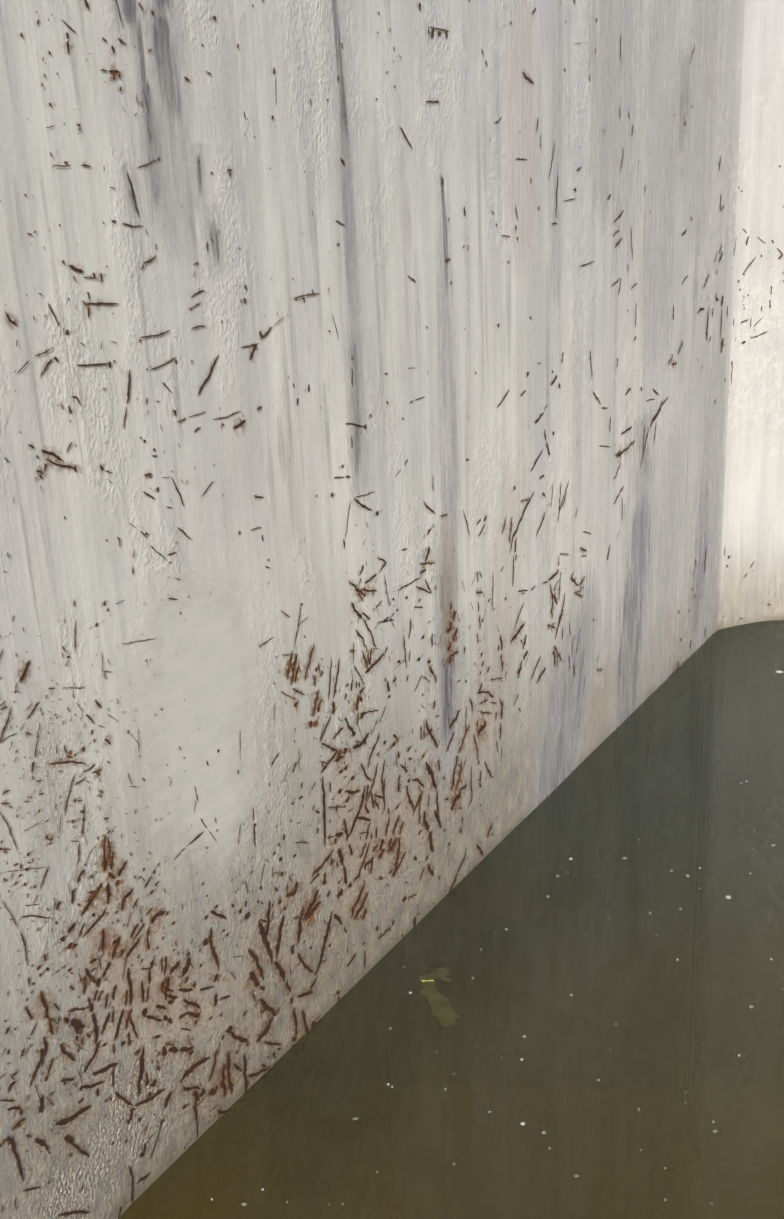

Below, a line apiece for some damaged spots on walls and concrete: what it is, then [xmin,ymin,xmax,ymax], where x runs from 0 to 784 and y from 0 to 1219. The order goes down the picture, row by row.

water stain [124,0,180,207]
corrosion [62,260,118,318]
water stain [210,223,219,261]
corrosion [241,314,288,360]
corrosion [697,225,784,383]
corrosion [0,341,591,1219]